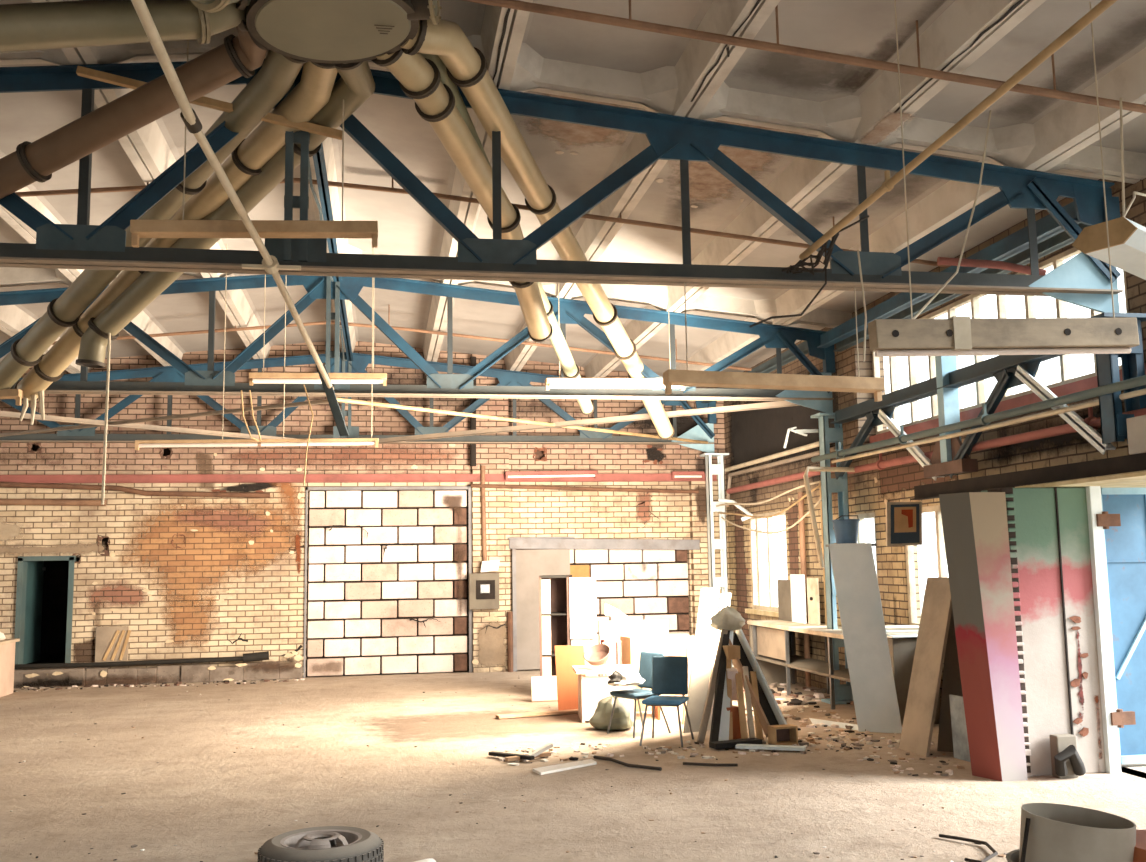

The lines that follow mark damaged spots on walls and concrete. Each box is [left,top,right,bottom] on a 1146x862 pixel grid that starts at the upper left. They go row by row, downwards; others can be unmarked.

peeling [89,444,455,645]